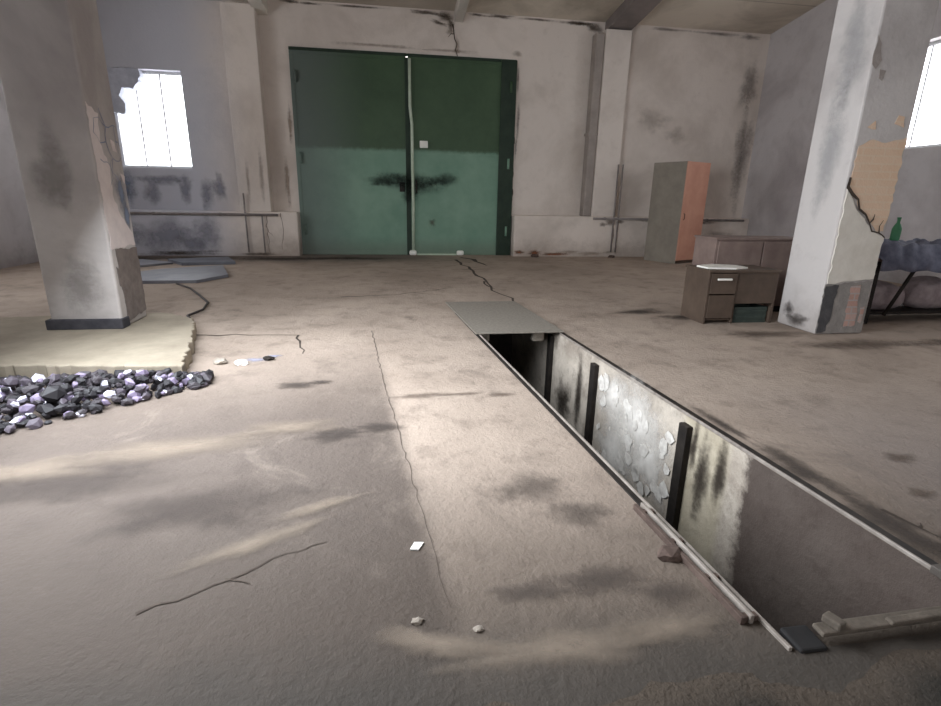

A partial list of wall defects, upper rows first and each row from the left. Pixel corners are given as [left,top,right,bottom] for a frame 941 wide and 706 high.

peeling [850,115,907,232]
crack [455,257,514,301]
spalling [815,281,872,334]
damp [689,428,725,507]